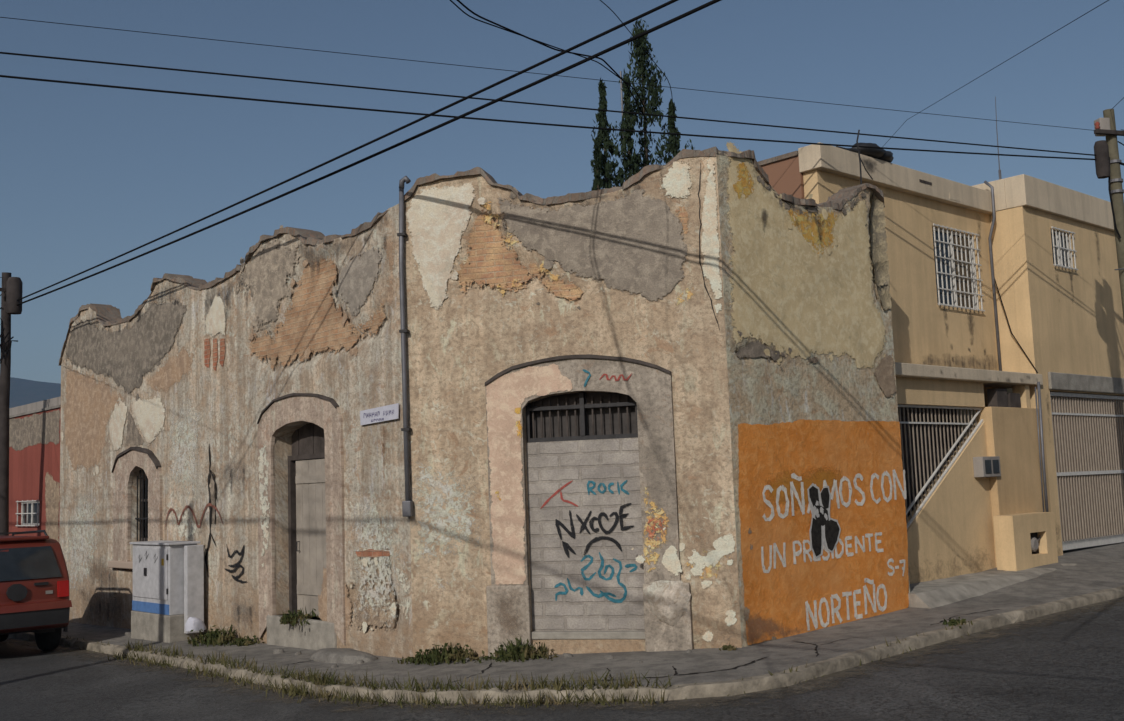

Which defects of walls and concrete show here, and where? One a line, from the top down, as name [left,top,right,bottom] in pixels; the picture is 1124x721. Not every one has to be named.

flaking render [248,235,395,370]
flaking render [406,183,583,311]
flaking render [660,142,896,398]
flaking render [9,295,226,475]
flaking render [45,472,60,542]
spalling [345,548,411,634]
spalling [693,607,750,647]